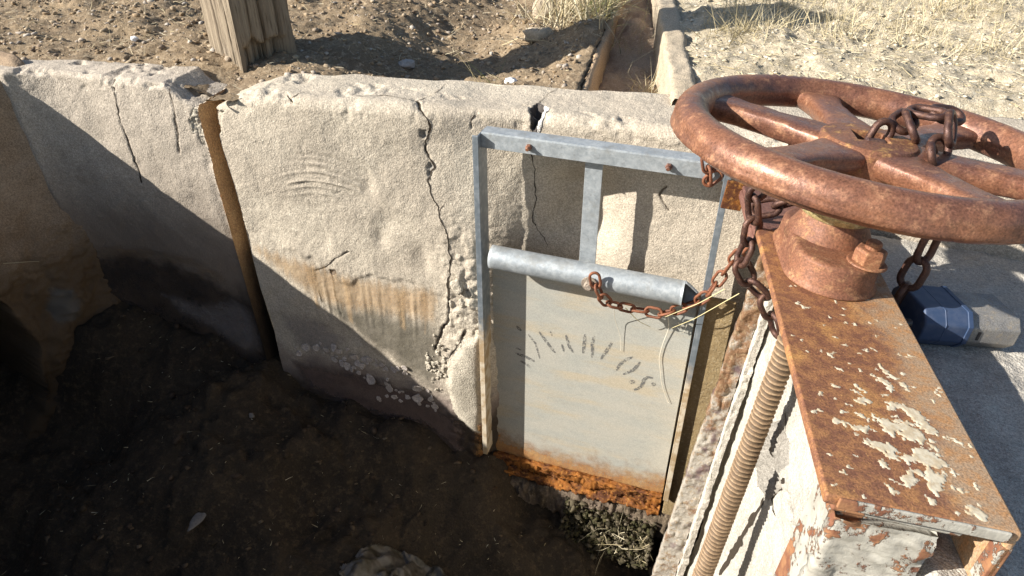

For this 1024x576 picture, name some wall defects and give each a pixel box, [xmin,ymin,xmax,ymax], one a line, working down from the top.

crack [113,79,142,183]
crack [168,88,180,153]
crack [354,86,467,359]
crack [531,90,556,245]
corrosion [477,428,665,516]
peeling [791,300,989,522]